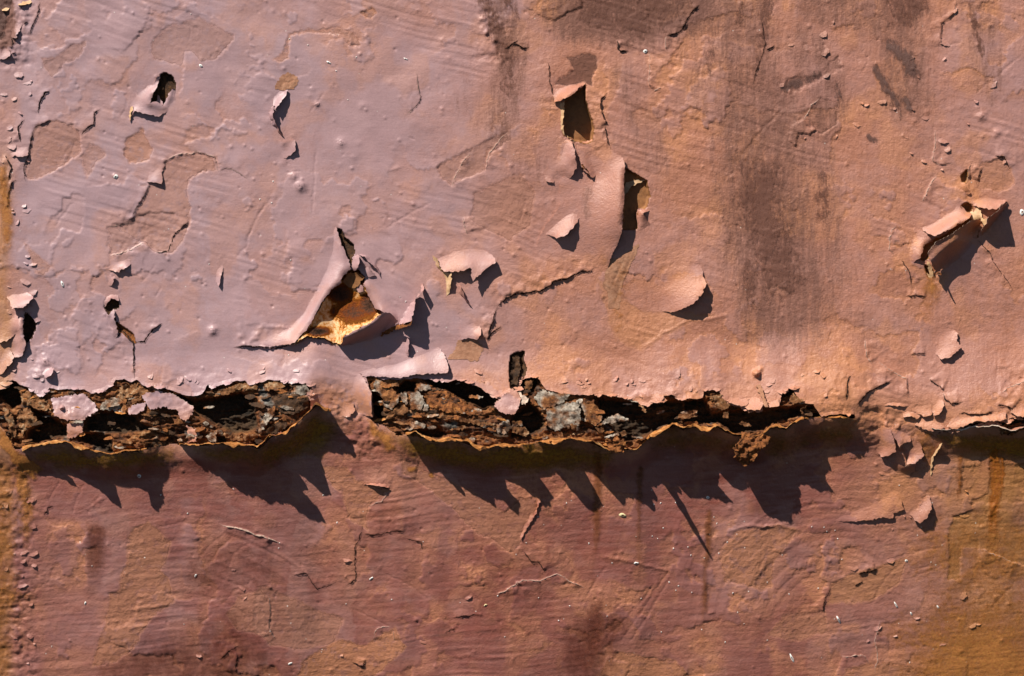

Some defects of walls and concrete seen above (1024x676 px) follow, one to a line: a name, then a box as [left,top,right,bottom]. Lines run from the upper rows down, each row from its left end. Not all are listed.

peeling [129,17,233,120]
water stain [780,71,821,92]
water stain [872,64,912,114]
water stain [886,39,919,76]
peeling [535,55,707,313]
water stain [733,158,806,304]
peeling [906,165,1008,277]
crack [114,318,161,371]
spalling [0,228,855,467]
crack [487,267,595,341]
rust [370,420,611,535]
peeling [873,399,1024,478]